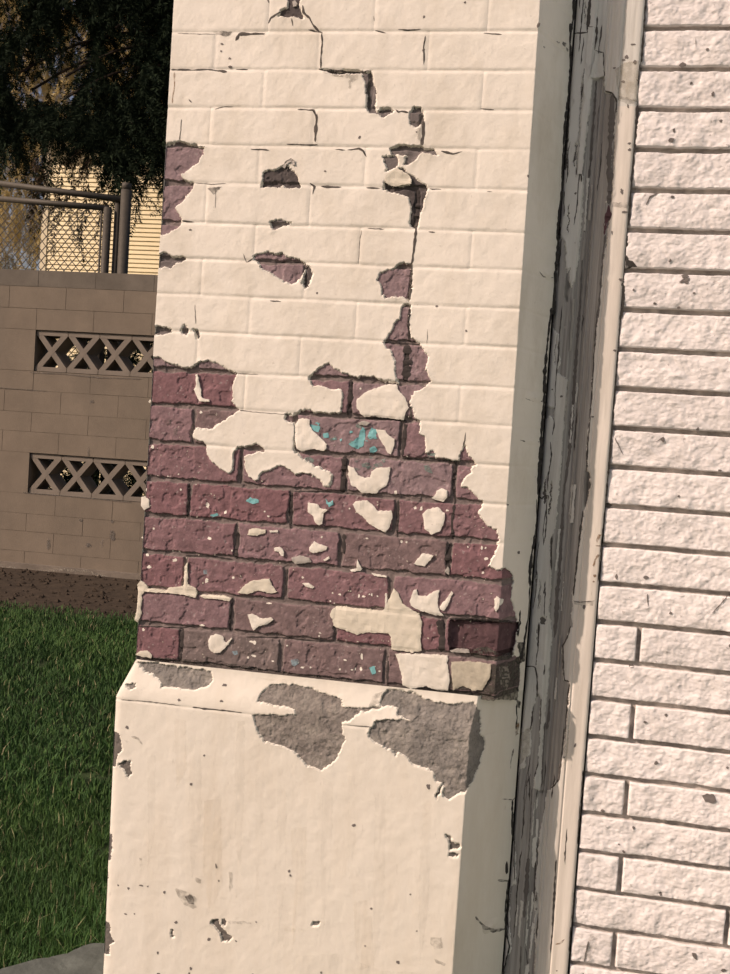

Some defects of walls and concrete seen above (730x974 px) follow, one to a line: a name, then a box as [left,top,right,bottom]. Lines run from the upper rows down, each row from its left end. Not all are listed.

peeling [159,253,186,269]
peeling [161,142,204,235]
peeling [270,220,291,230]
peeling [262,166,301,189]
peeling [255,252,318,294]
crack [310,183,340,192]
peeling [383,146,437,227]
crack [409,223,434,300]
peeling [574,27,637,257]
peeling [135,263,520,799]
peeling [536,484,576,699]
spalling [207,919,237,942]